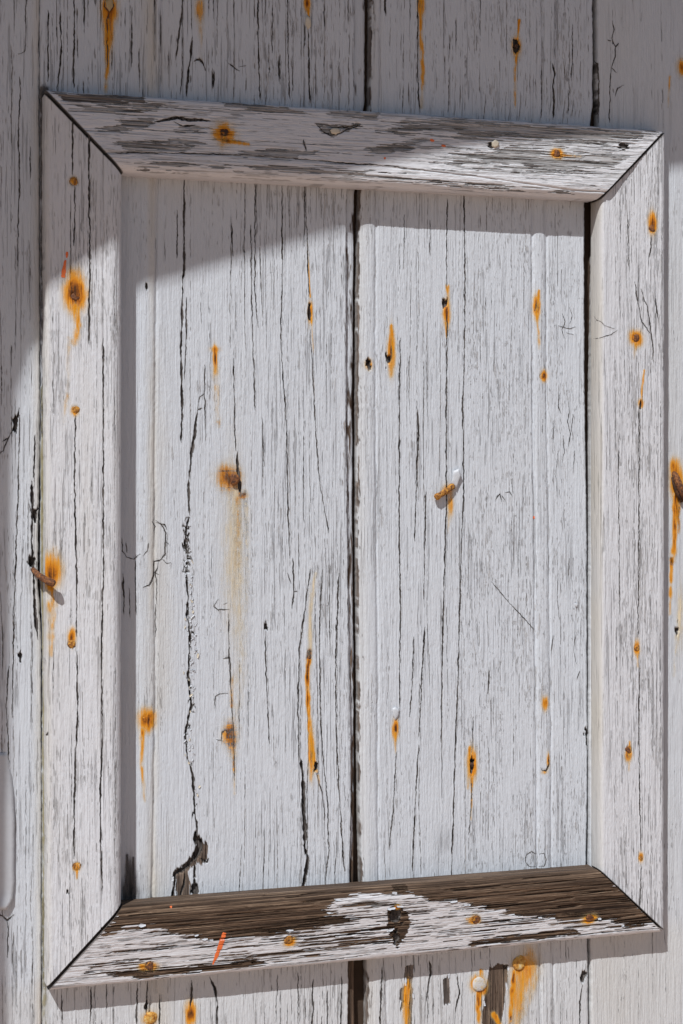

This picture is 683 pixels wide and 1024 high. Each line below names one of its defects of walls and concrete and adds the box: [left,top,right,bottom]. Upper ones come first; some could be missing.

peeling [51,91,575,195]
peeling [222,102,651,174]
rust [63,269,88,342]
rust [387,324,395,375]
rust [533,290,541,343]
crack [71,118,235,896]
rust [669,458,683,638]
rust [45,554,61,628]
rust [305,577,318,779]
rust [139,709,155,781]
peeling [84,836,655,979]
rust [470,951,536,1024]